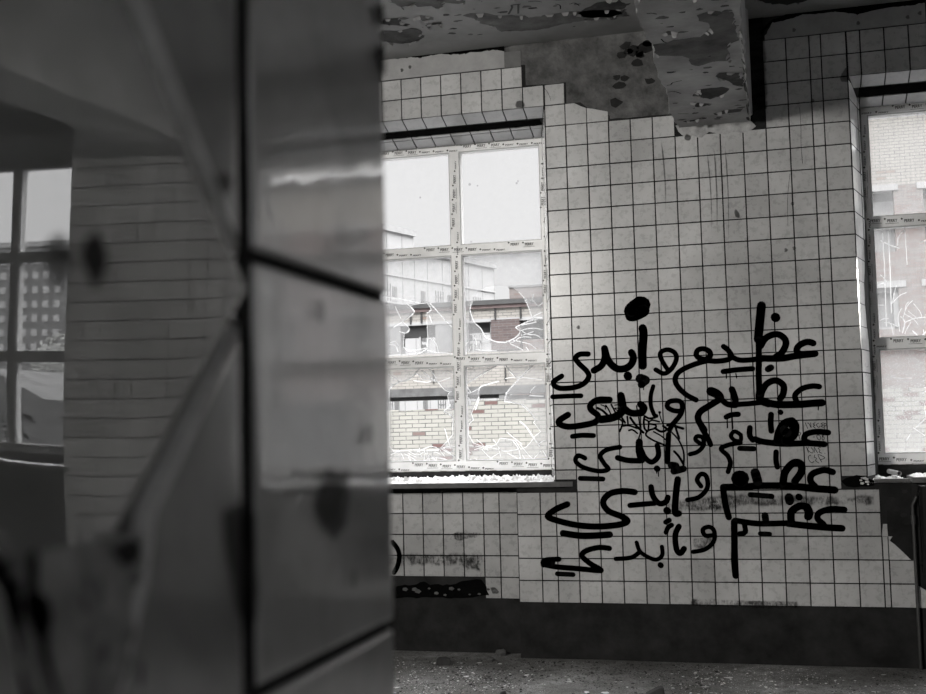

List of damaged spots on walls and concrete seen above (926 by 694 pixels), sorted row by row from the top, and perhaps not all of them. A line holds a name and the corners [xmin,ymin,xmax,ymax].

peeling [375,0,640,76]
peeling [504,0,751,123]